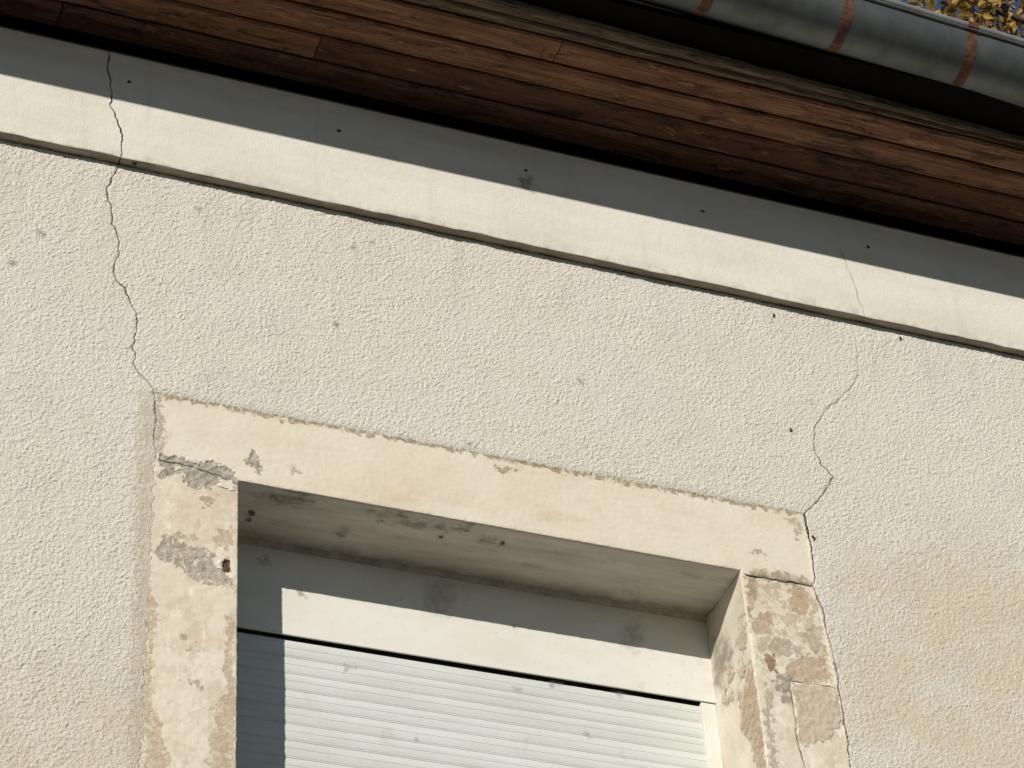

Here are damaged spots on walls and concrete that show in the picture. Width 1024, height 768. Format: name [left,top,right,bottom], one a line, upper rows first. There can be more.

crack [106,51,238,485]
spalling [155,527,234,586]
spalling [154,397,238,491]
crack [746,347,858,767]